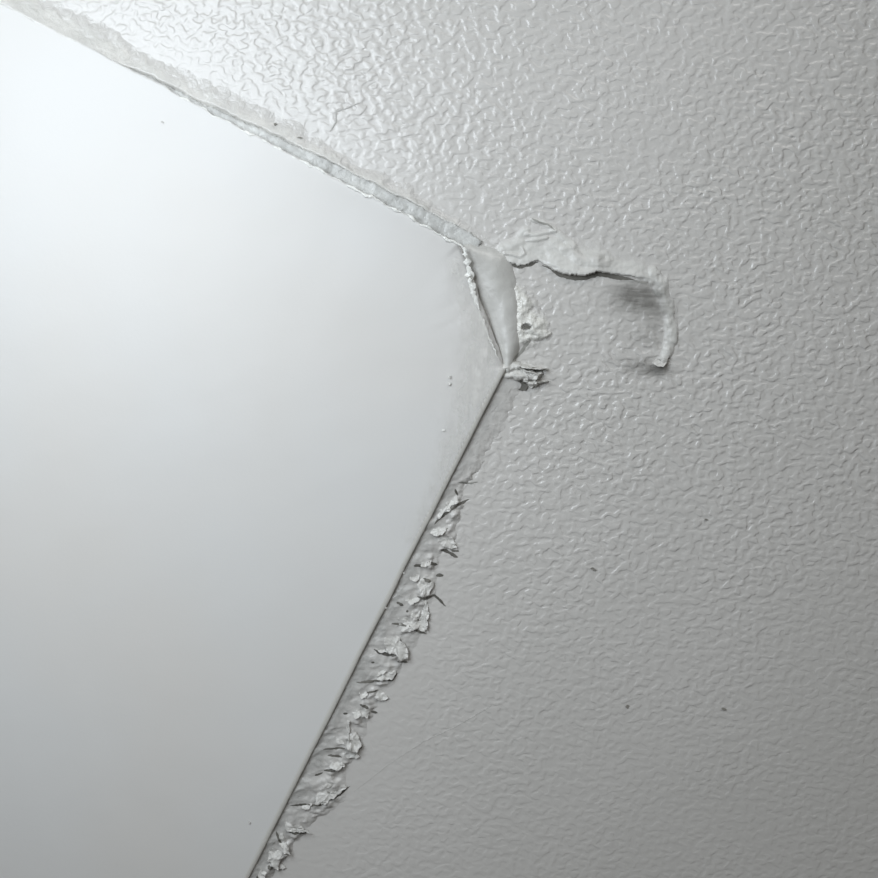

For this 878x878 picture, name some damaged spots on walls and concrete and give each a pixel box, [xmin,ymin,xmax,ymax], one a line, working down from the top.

peeling [495,217,679,367]
peeling [509,362,539,391]
peeling [437,535,459,558]
peeling [315,559,446,776]
peeling [290,783,350,810]
peeling [256,822,313,878]